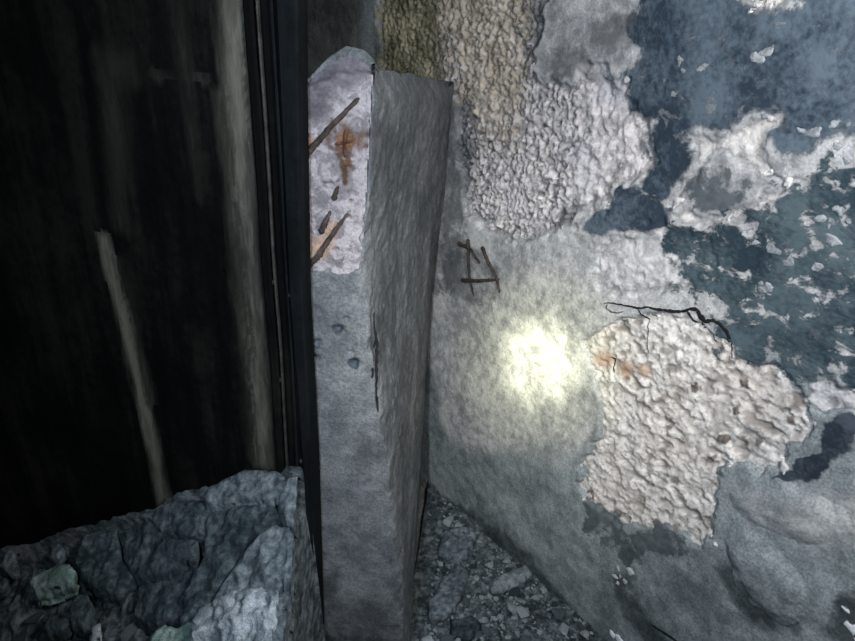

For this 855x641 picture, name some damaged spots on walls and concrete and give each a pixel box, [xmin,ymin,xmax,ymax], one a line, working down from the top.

spalling [748,0,783,14]
peeling [750,44,774,64]
spalling [308,74,373,274]
rust [326,124,368,185]
spalling [415,0,653,239]
spalling [699,113,778,178]
peeling [796,119,841,138]
spalling [599,228,713,292]
peeling [752,238,795,266]
peeling [808,205,851,247]
crack [604,302,733,358]
spalling [577,312,855,547]